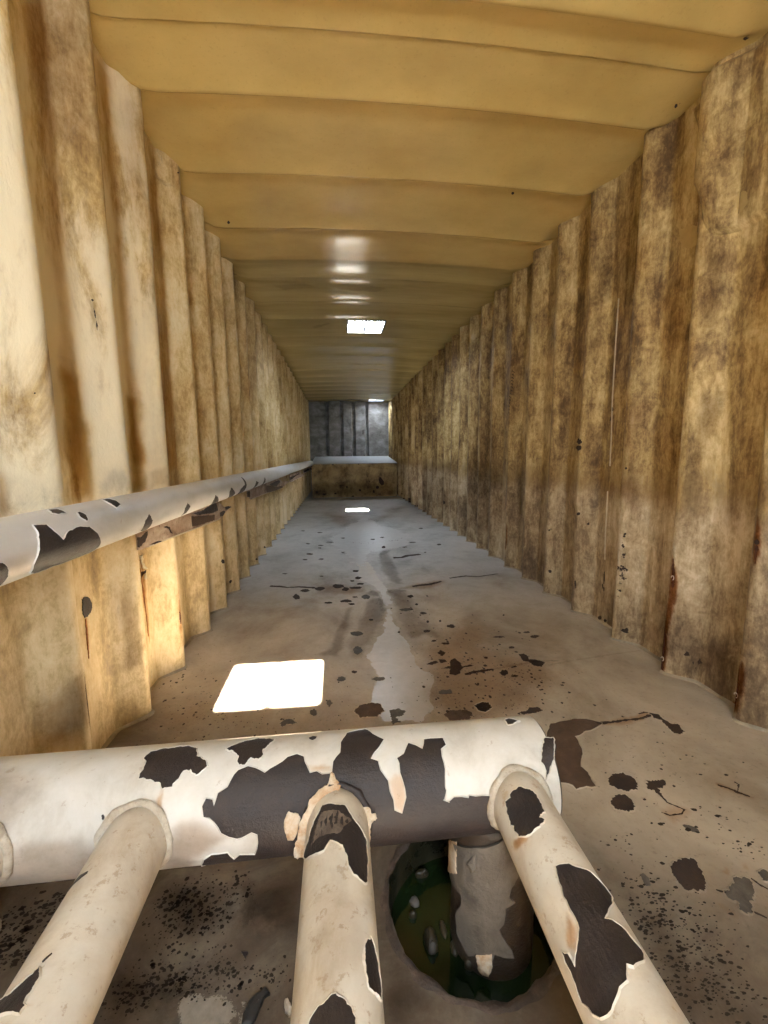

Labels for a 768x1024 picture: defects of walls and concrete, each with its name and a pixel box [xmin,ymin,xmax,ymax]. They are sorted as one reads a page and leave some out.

peeling [0,562,9,586]
peeling [29,508,101,574]
corrosion [139,554,149,636]
peeling [137,514,153,548]
peeling [181,488,250,516]
corrosion [661,559,676,671]
corrosion [734,664,744,710]
peeling [138,745,209,790]
spalling [540,718,603,790]
peeling [201,729,645,1024]